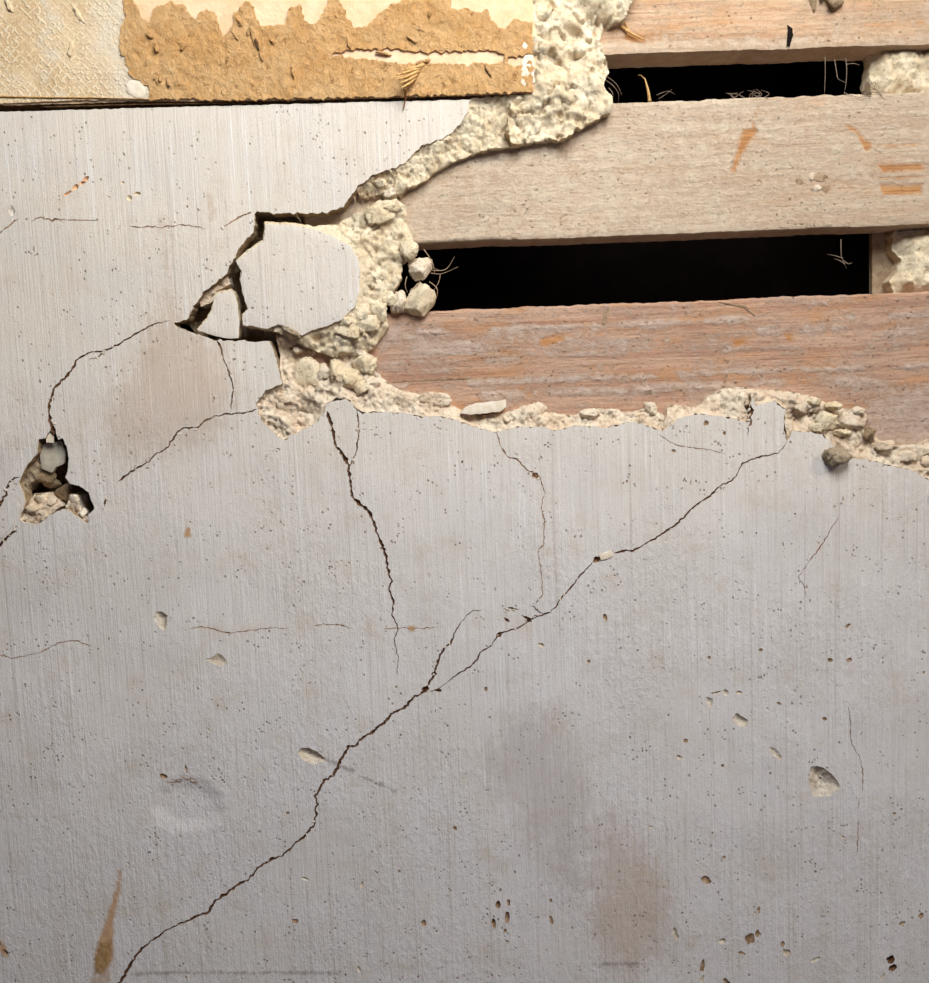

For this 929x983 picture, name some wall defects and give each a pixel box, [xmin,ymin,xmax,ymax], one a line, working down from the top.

flaking render [357,0,633,200]
crack [130,212,251,230]
flaking render [231,265,247,314]
flaking render [242,215,305,254]
crack [48,320,169,435]
crack [102,339,256,510]
flaking render [185,306,929,480]
crack [0,477,19,506]
spalling [0,433,94,538]
crack [118,404,787,983]
peeling [808,766,841,797]
rust [92,872,121,983]